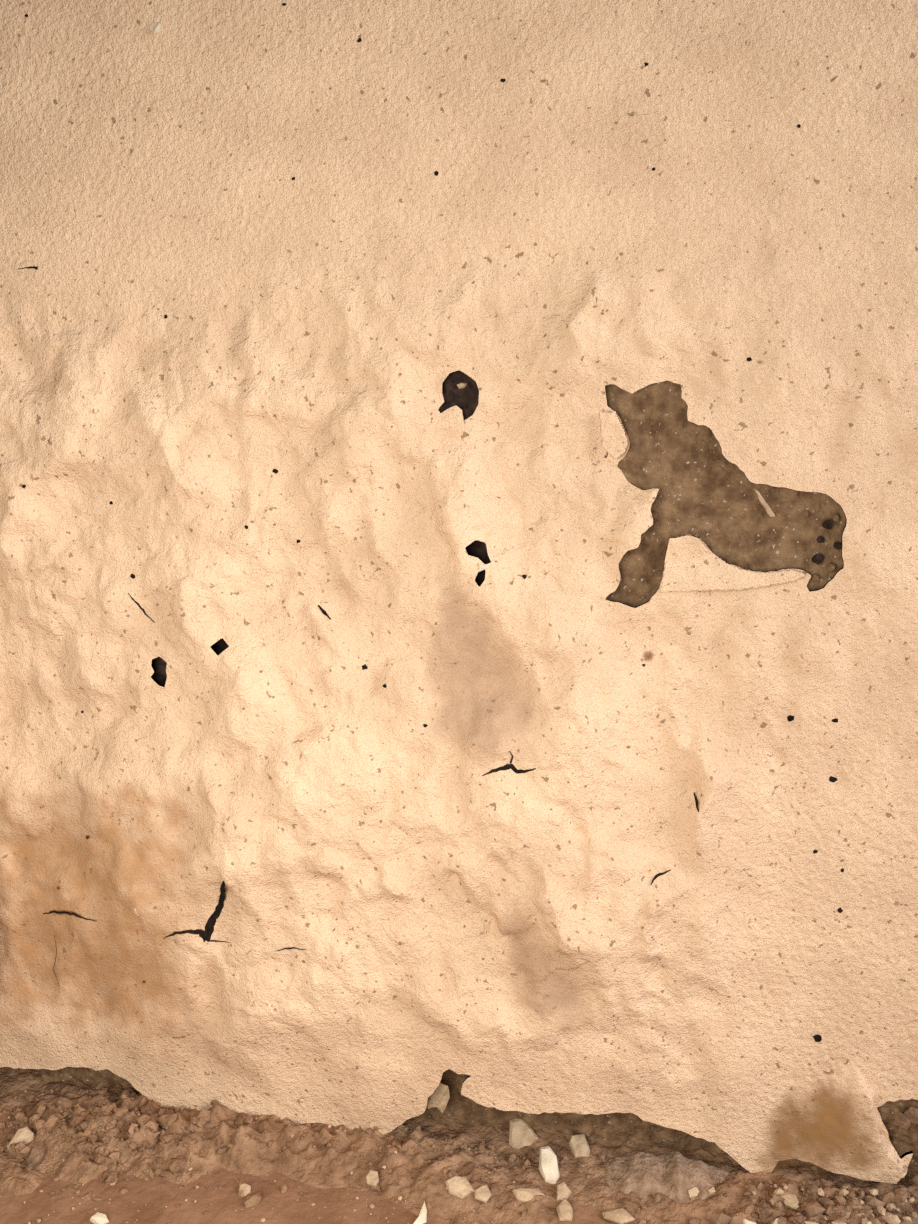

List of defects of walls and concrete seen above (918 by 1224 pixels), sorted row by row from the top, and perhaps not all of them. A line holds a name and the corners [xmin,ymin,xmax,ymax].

spalling [599,381,846,607]
crack [163,878,230,943]
peeling [412,1069,727,1224]
spalling [877,1099,918,1185]
spalling [602,1208,635,1224]